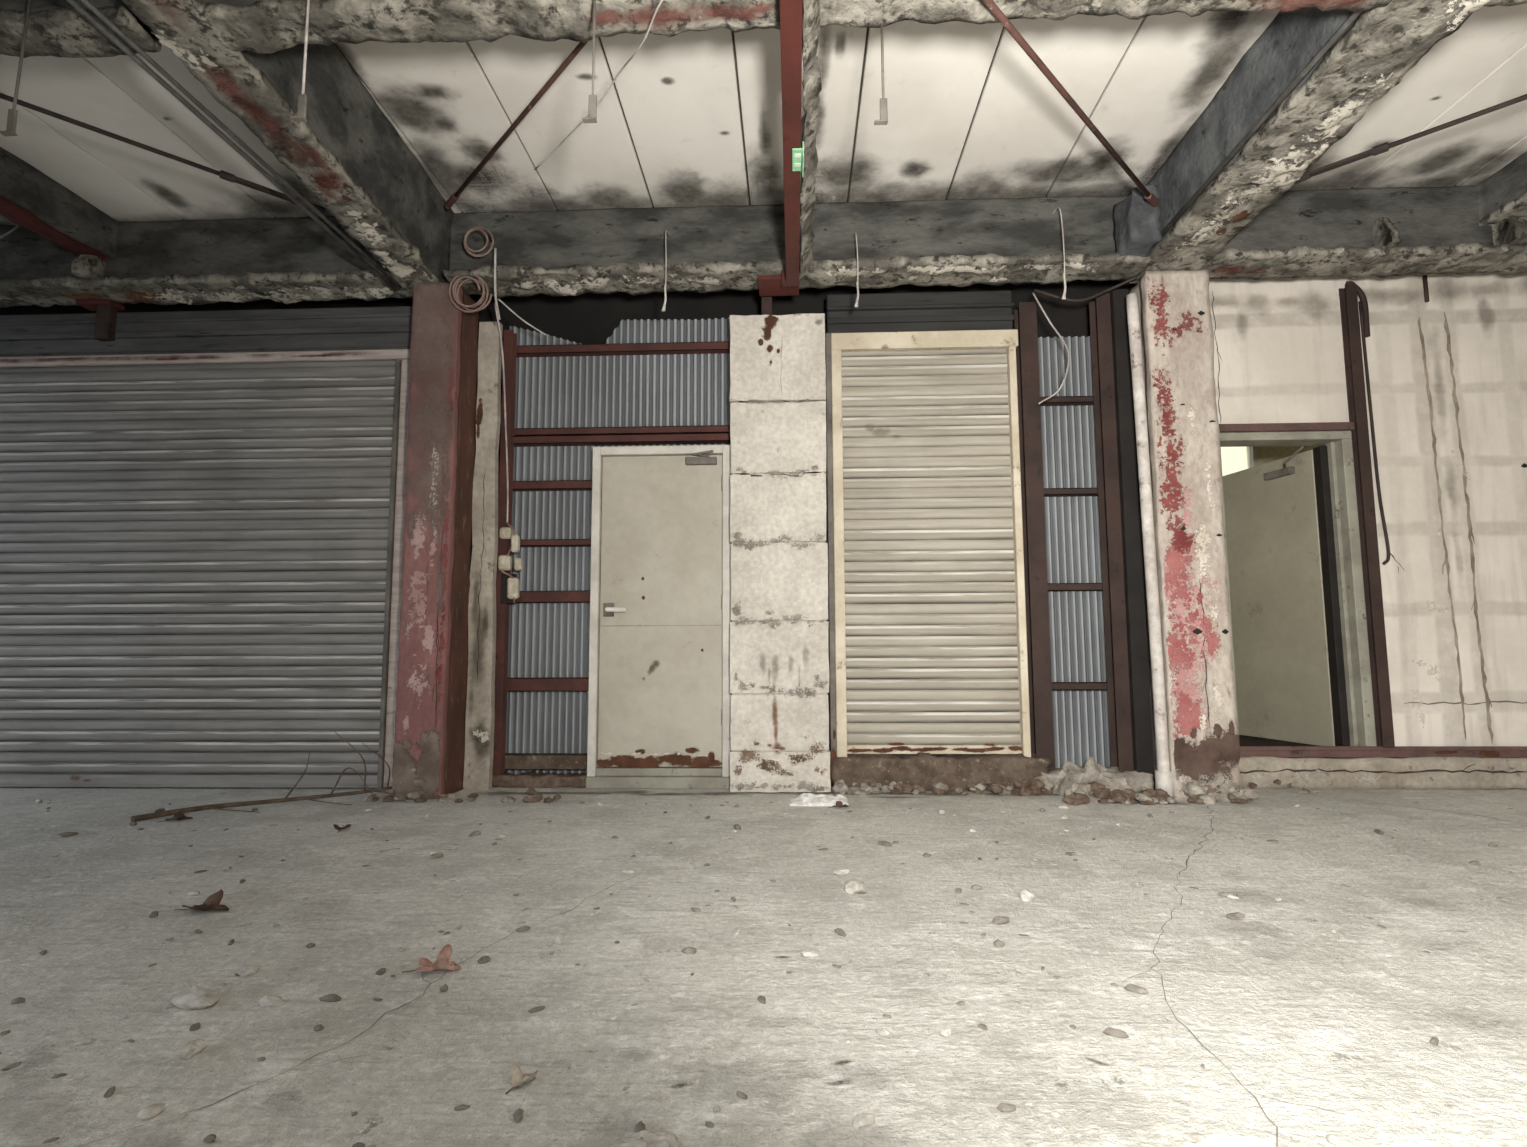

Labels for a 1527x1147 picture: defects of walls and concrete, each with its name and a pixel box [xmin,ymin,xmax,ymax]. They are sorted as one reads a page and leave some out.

leakage [1188,10,1249,101]
spalling [1411,0,1491,33]
leakage [470,122,784,213]
leakage [815,150,1132,204]
spalling [1167,72,1403,262]
leakage [1291,148,1508,191]
peeling [142,206,456,800]
peeling [1148,282,1330,794]
rust [597,747,722,768]
rust [768,703,784,752]
rust [830,730,1022,784]
crack [1126,805,1342,1147]